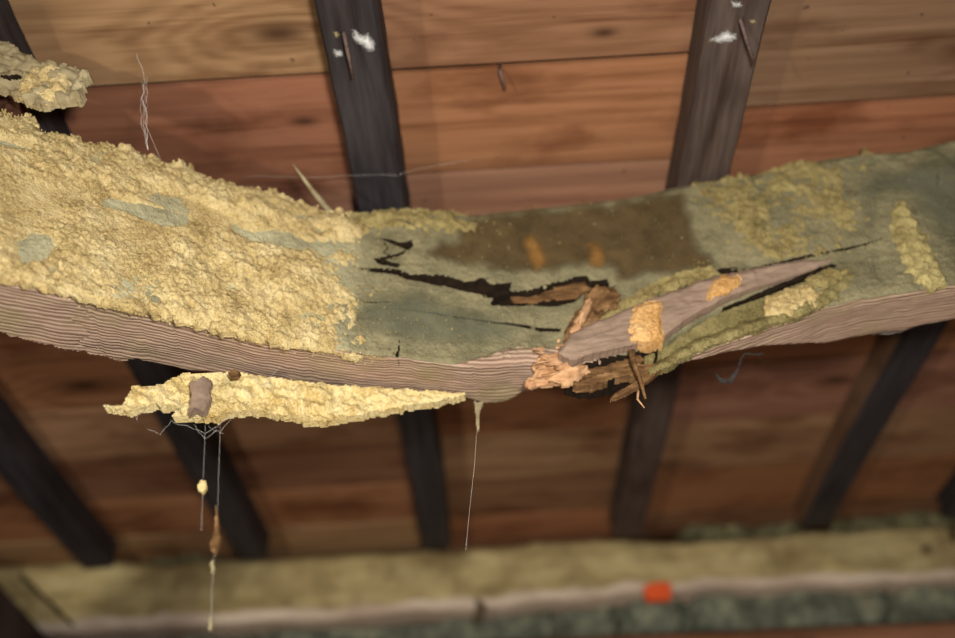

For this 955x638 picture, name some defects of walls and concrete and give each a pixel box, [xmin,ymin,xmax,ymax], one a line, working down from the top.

damp [432,195,710,279]
damp [373,302,499,335]
crack [360,238,609,332]
crack [717,238,881,312]
crack [563,349,658,400]